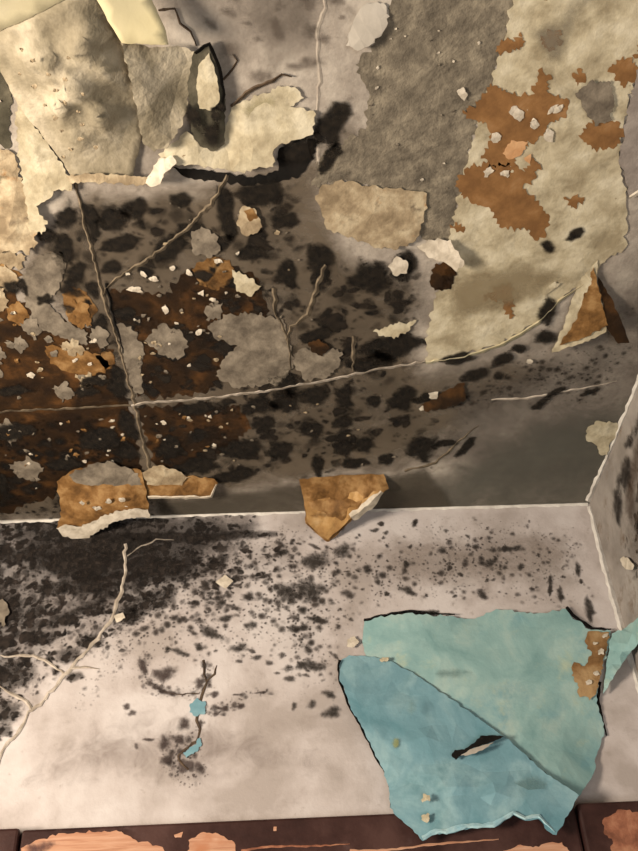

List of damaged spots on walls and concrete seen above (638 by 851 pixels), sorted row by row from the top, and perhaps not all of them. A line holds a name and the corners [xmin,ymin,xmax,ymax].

peeling [346,2,390,51]
water stain [0,102,638,740]
crack [0,538,172,759]
water stain [135,719,204,785]
crack [145,654,267,773]
peeling [337,606,638,851]
peeling [21,830,164,851]
peeling [174,832,235,851]